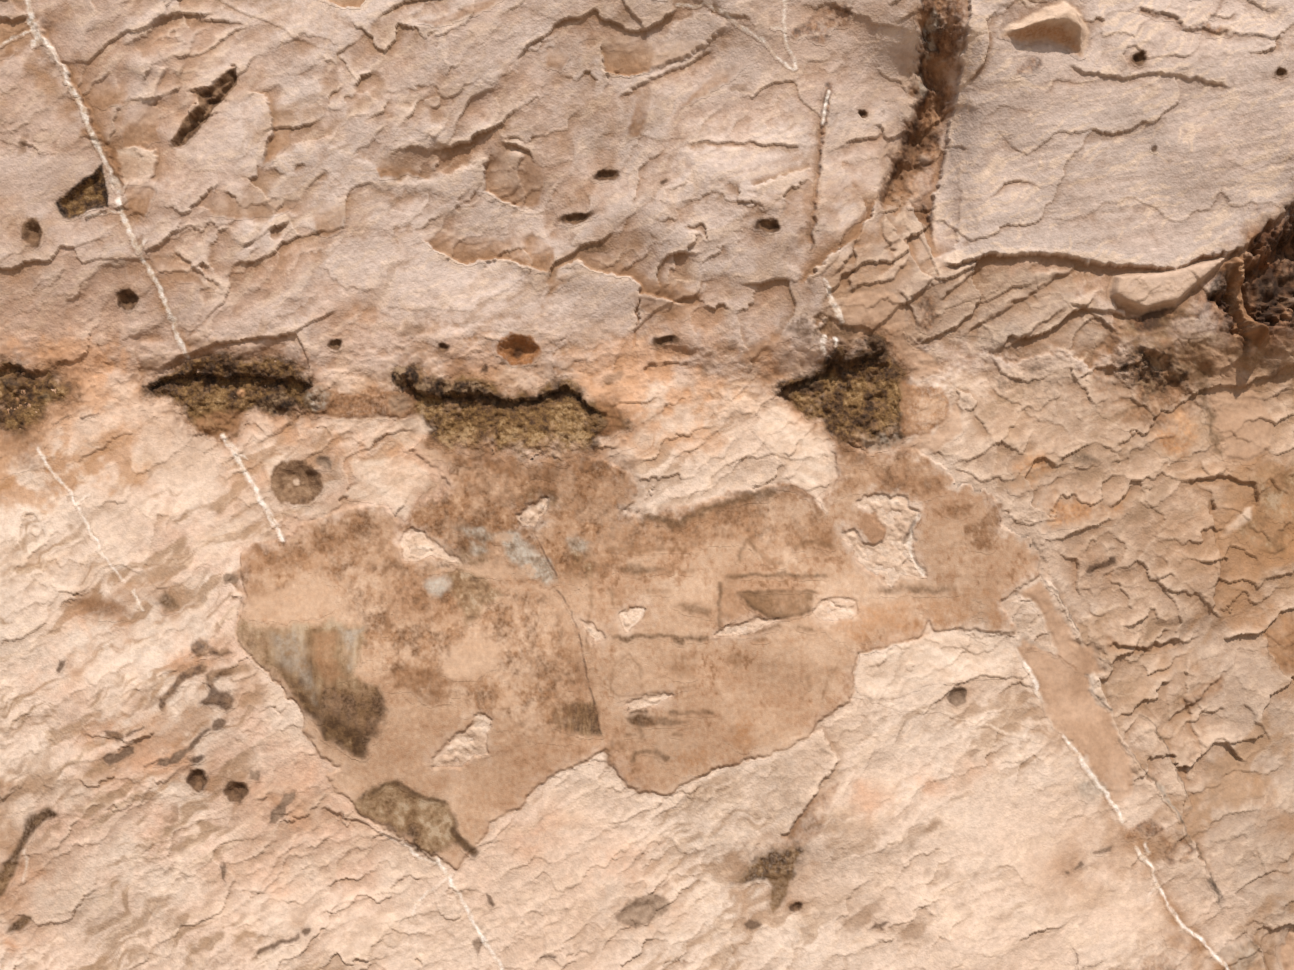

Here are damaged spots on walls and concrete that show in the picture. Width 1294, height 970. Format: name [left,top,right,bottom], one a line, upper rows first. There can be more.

crack [0,0,191,360]
leakage [0,341,96,480]
crack [35,411,145,612]
crack [219,432,287,543]
leakage [126,303,1137,763]
leakage [348,776,481,860]
leakage [660,706,762,778]
crack [852,572,1274,970]
crack [379,830,507,970]